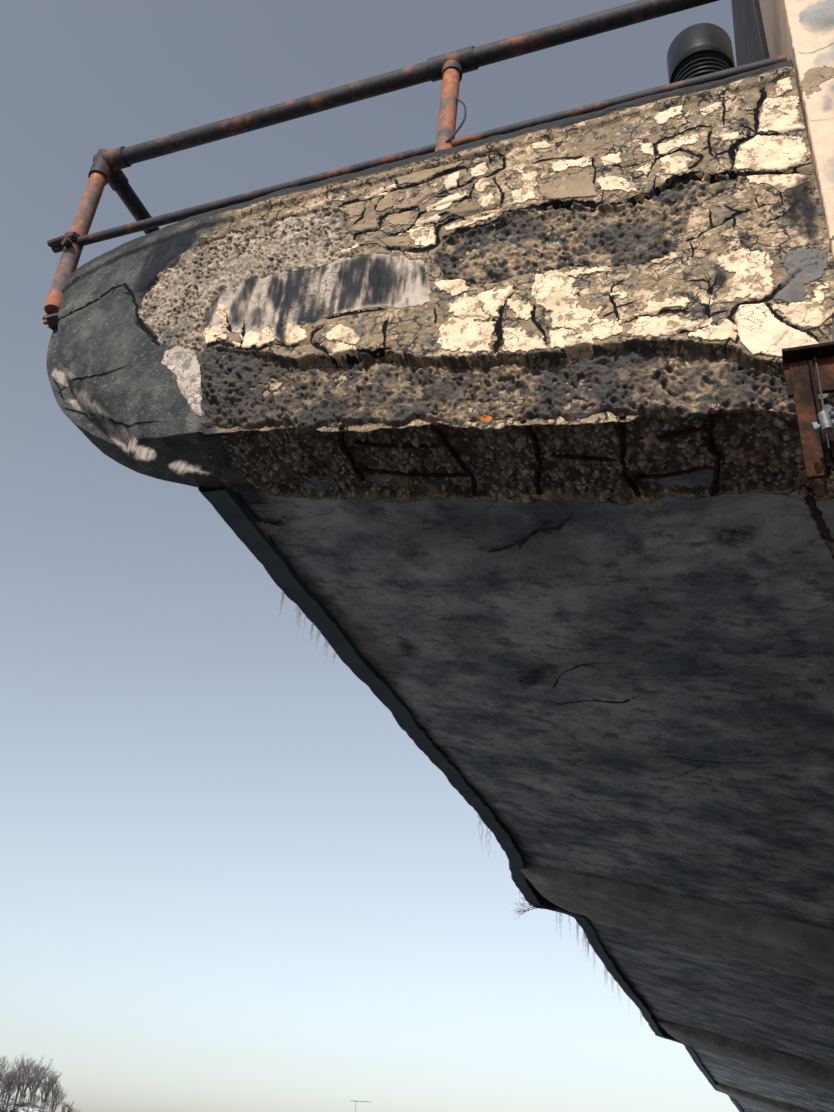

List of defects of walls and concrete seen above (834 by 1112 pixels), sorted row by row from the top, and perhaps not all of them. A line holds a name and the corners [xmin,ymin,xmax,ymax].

crack [339,86,826,358]
crack [48,281,160,346]
crack [207,307,392,369]
spalling [138,65,834,501]
crack [54,365,168,427]